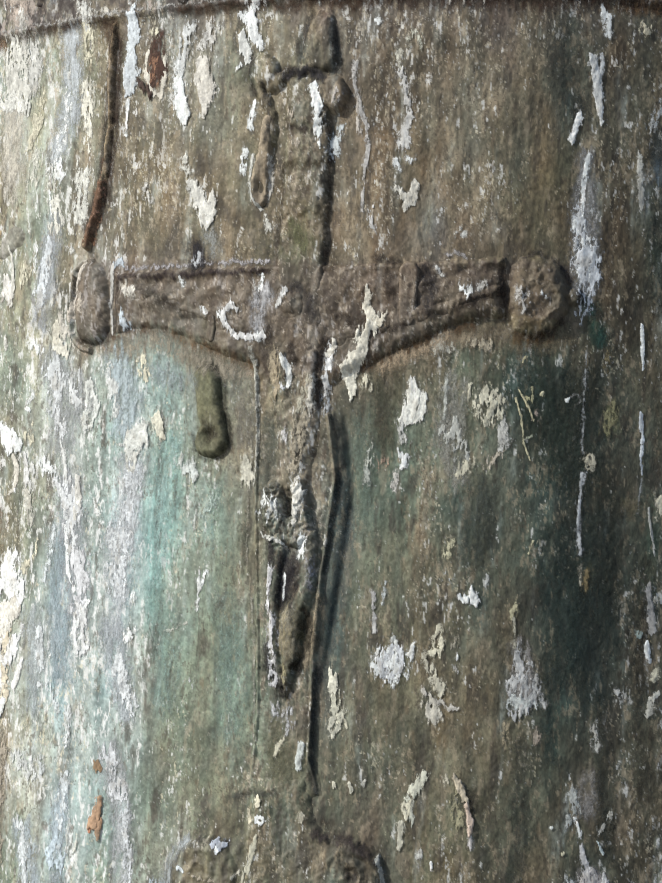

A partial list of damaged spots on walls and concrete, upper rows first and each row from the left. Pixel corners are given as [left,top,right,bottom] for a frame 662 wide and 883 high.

rust [136,22,168,101]
damp [393,29,423,171]
damp [600,4,613,38]
rust [81,103,118,247]
damp [394,178,420,212]
damp [523,11,605,325]
damp [637,98,662,211]
damp [375,254,399,308]
damp [626,411,645,517]
damp [369,581,386,633]
damp [373,264,619,883]
peeling [370,635,415,688]